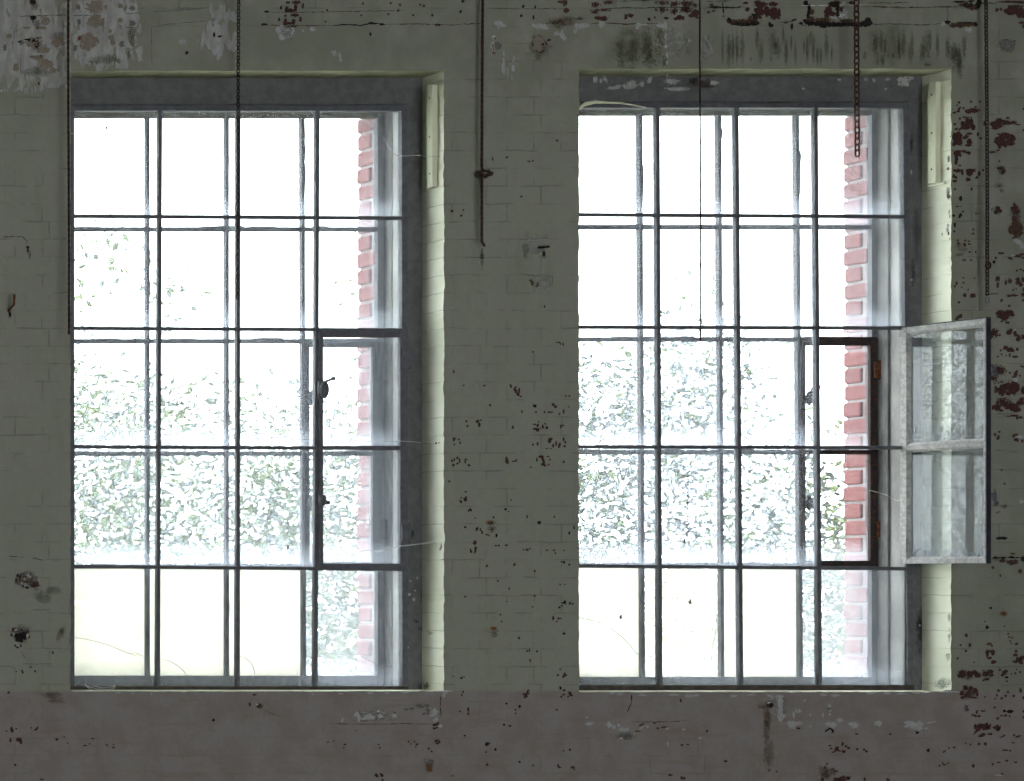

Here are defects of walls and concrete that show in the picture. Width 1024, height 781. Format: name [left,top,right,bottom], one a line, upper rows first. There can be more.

peeling [0,0,144,94]
peeling [178,3,239,60]
peeling [261,0,328,41]
peeling [743,0,781,22]
peeling [803,0,863,22]
peeling [941,101,1024,261]
peeling [991,276,1024,420]
peeling [521,395,570,468]
spalling [15,572,40,589]
spalling [10,627,54,674]
flaking render [189,676,469,752]
peeling [585,626,1024,776]